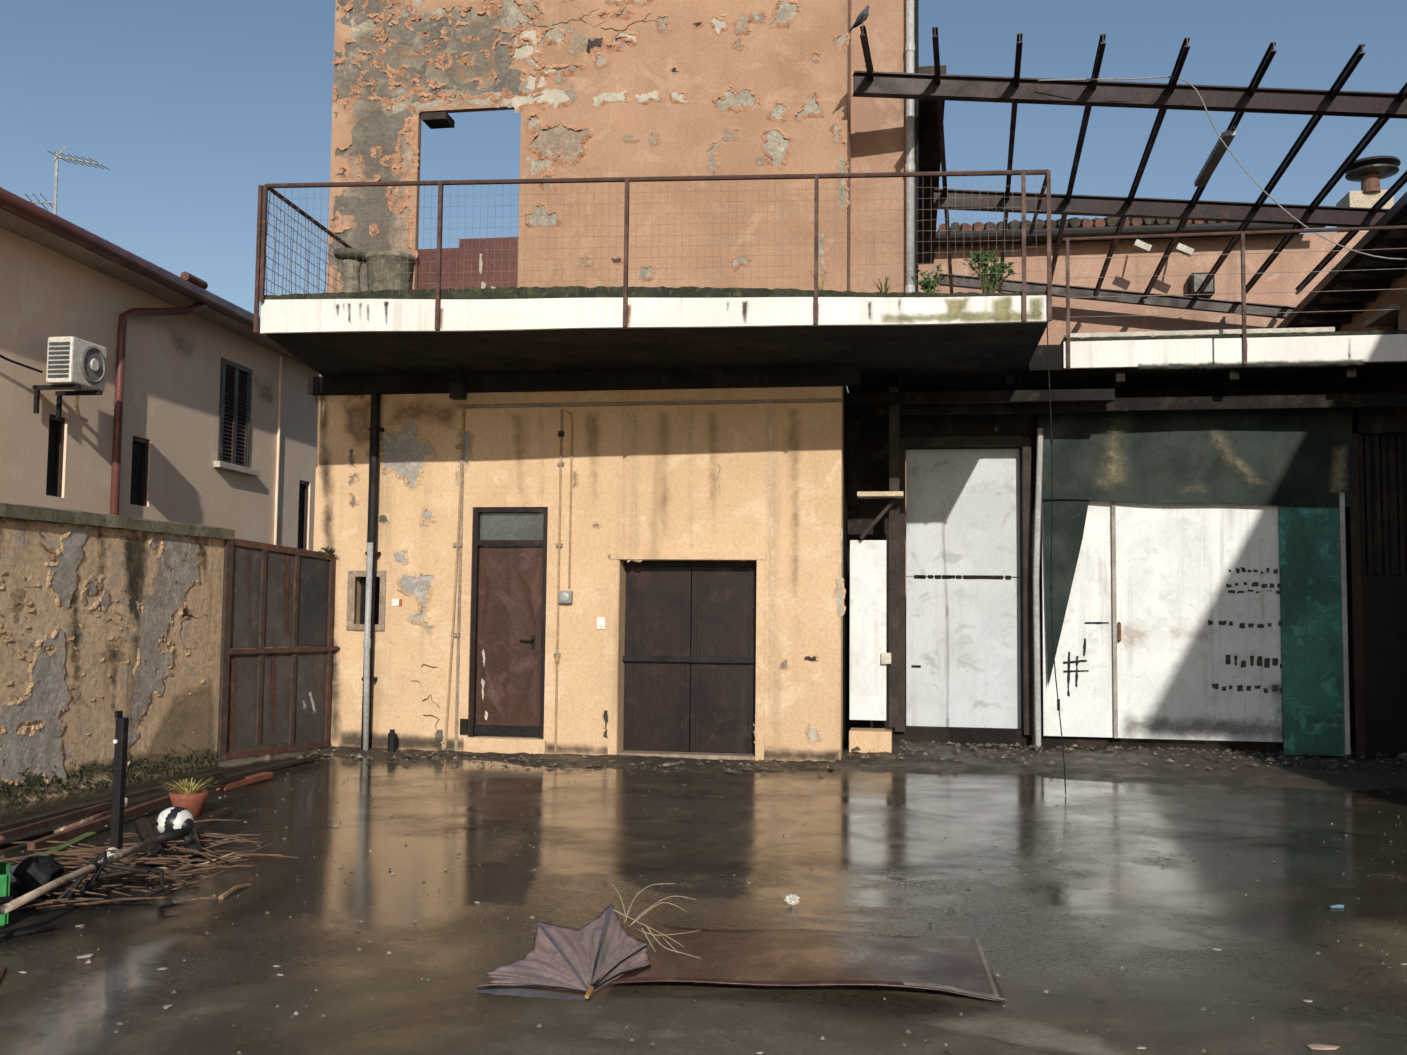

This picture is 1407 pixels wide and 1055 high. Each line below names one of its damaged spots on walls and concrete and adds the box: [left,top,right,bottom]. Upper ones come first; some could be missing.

peeling [692,0,802,52]
flaking render [328,0,690,286]
peeling [705,83,850,210]
peeling [818,233,828,276]
water stain [868,297,1041,322]
peeling [43,512,201,773]
peeling [394,548,436,636]
peeling [0,627,72,790]